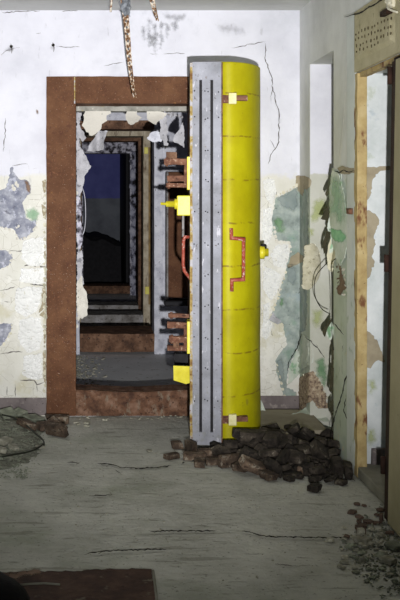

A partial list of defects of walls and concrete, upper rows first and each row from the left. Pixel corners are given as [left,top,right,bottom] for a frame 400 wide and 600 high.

peeling [125,111,185,149]
crack [235,42,280,163]
peeling [321,166,354,296]
peeling [367,210,379,279]
peeling [0,167,47,393]
peeling [262,176,334,417]
peeling [367,331,385,368]
crack [330,375,347,439]
crack [97,463,170,473]
crack [85,547,166,555]
crack [150,527,212,535]
crack [244,531,349,539]